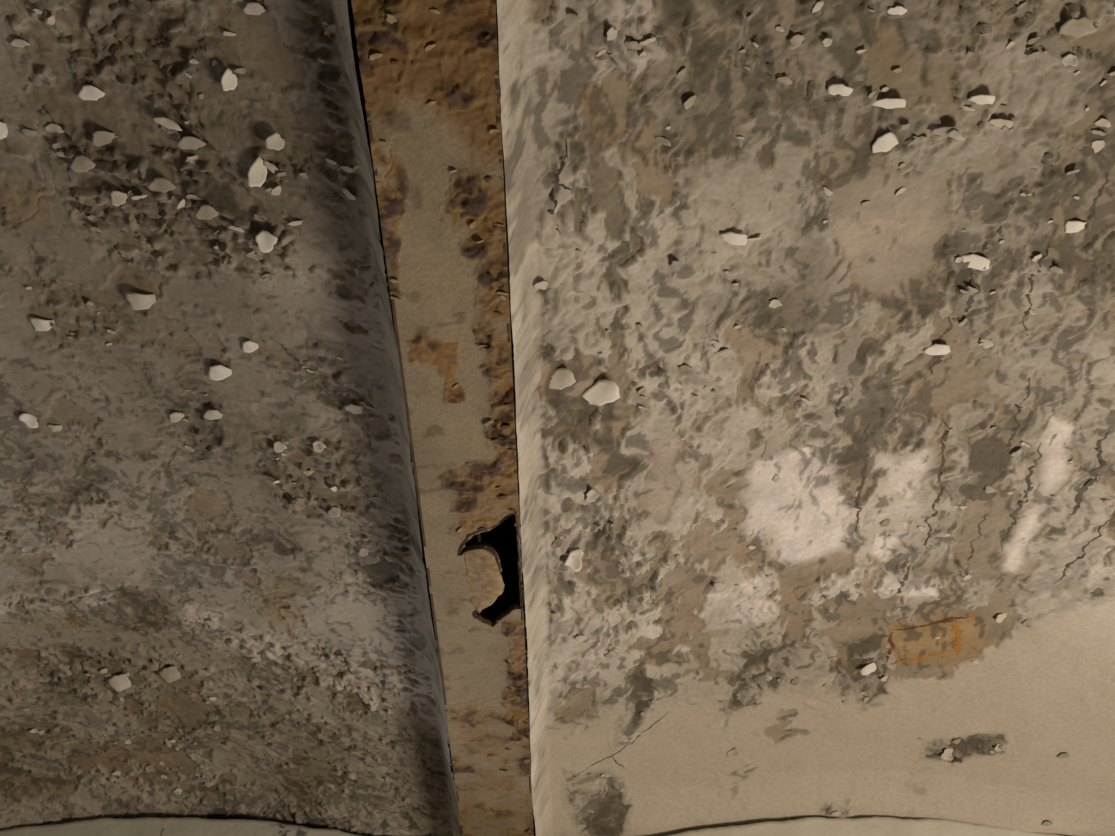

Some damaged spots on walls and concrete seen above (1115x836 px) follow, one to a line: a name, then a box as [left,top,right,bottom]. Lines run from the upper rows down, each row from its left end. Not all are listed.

peeling [506,0,1115,586]
water stain [0,578,151,618]
water stain [165,568,446,749]
water stain [321,523,428,615]
peeling [519,309,840,747]
peeling [822,623,906,715]
rust [881,609,996,672]
peeling [995,612,1033,635]
peeling [916,730,1017,766]
water stain [193,803,447,836]